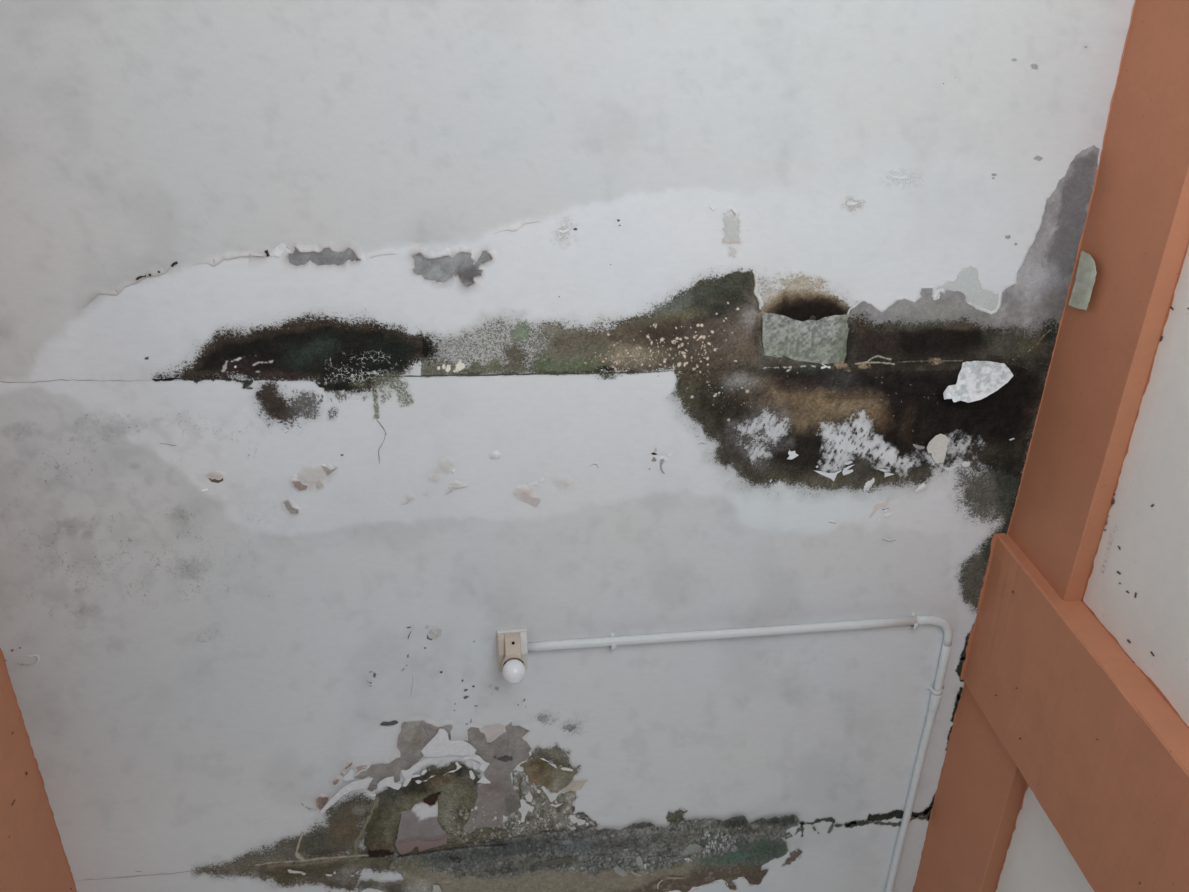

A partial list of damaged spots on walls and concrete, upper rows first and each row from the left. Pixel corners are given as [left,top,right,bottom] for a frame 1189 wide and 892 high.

peeling [74,215,541,311]
peeling [709,204,740,257]
spalling [762,142,1100,403]
water stain [149,267,1059,751]
peeling [395,801,447,855]
peeling [310,674,581,834]